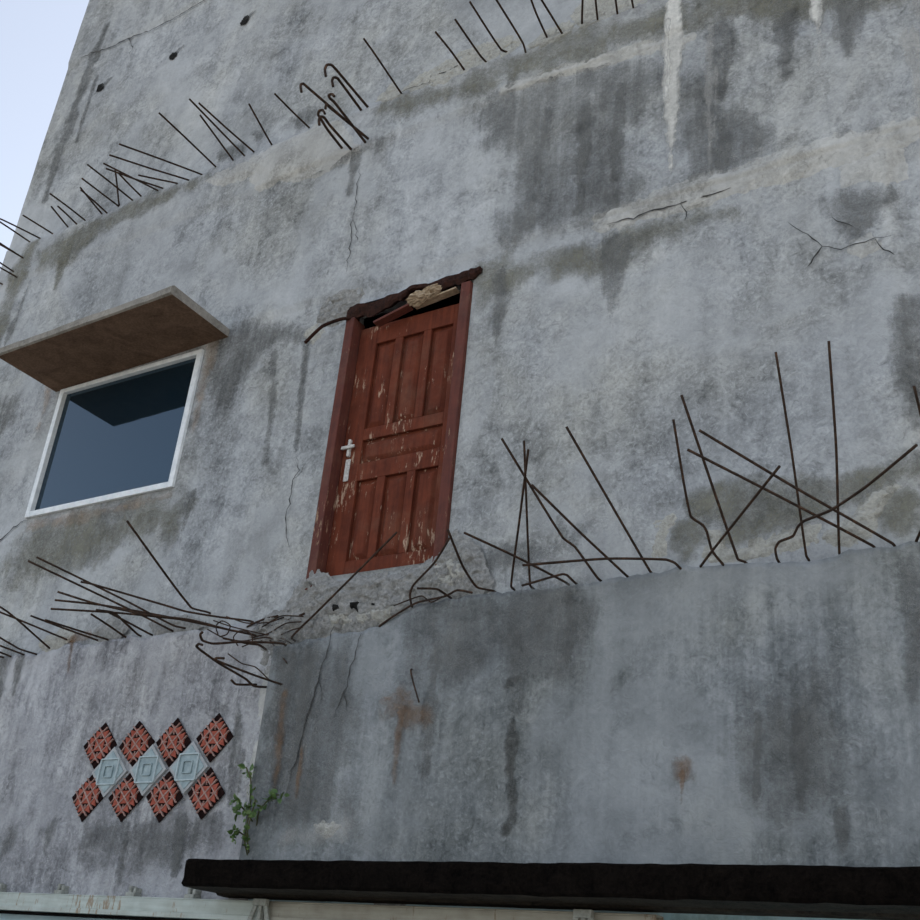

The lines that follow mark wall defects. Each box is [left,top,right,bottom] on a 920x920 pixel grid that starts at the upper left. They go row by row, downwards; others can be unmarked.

water stain [462,0,889,247]
crack [346,173,360,267]
water stain [547,224,676,297]
crack [609,188,729,224]
crack [789,217,893,267]
spalling [304,287,365,345]
spalling [0,341,918,688]
crack [286,627,362,793]
water stain [502,719,518,835]